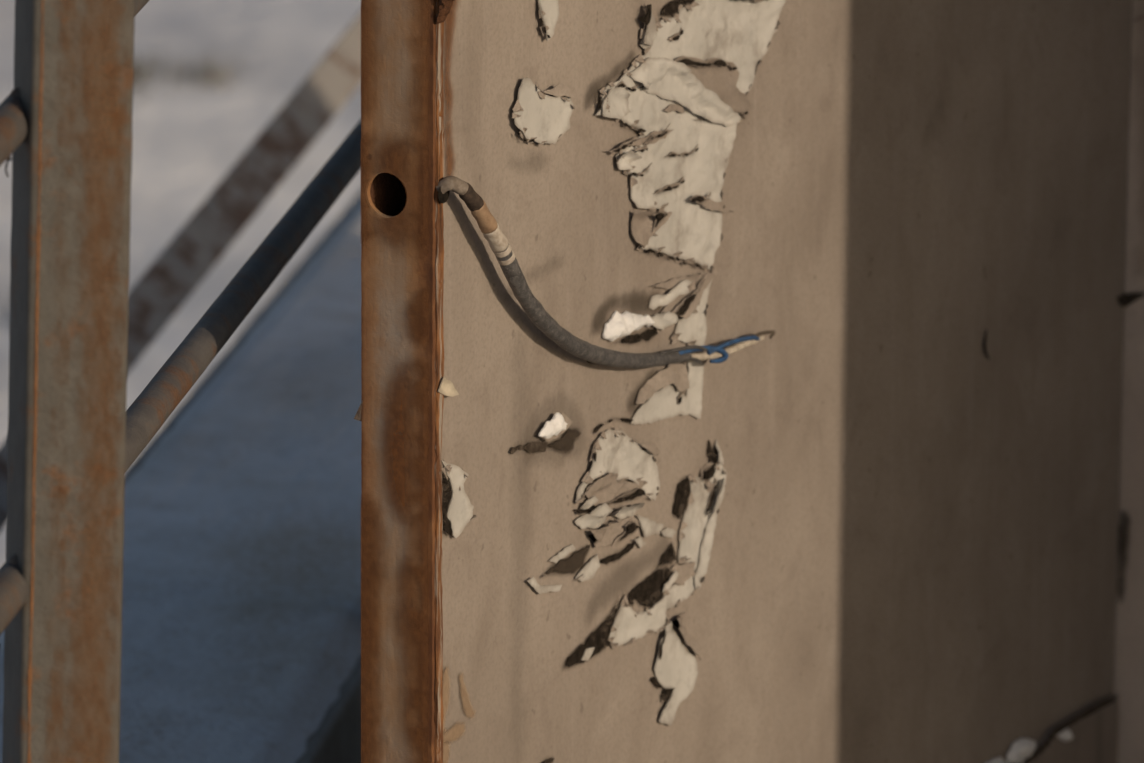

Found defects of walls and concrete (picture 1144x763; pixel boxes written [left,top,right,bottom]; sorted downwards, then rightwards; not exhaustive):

peeling [538,0,559,41]
rust [360,140,429,247]
peeling [512,78,577,145]
peeling [596,0,786,346]
rust [28,0,44,763]
rust [385,364,429,520]
peeling [441,459,477,539]
peeling [509,361,727,726]
rust [361,500,382,763]